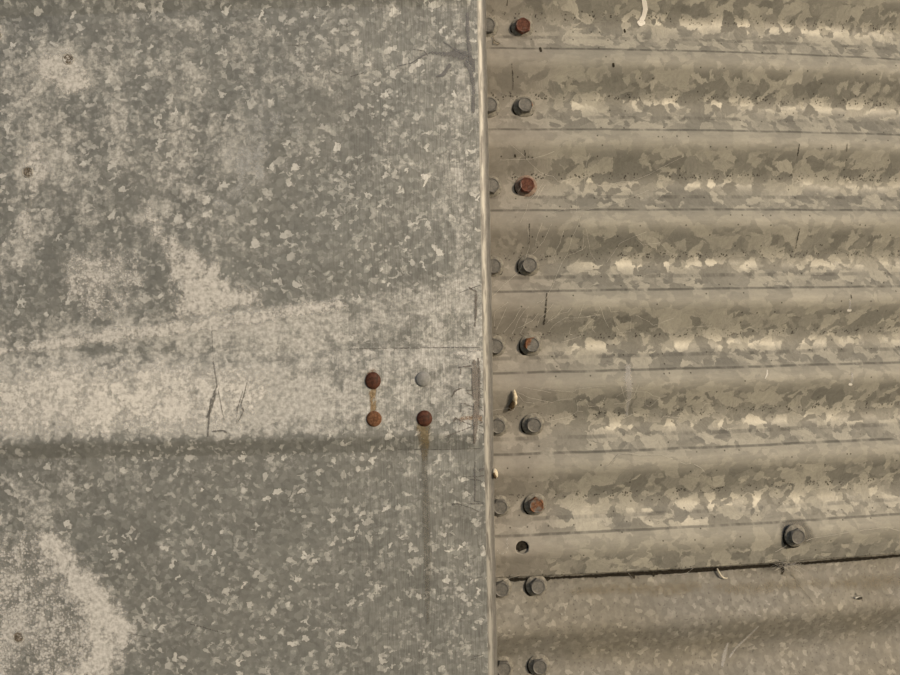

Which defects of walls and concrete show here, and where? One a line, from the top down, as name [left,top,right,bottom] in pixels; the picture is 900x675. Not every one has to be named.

corrosion [417,424,429,461]